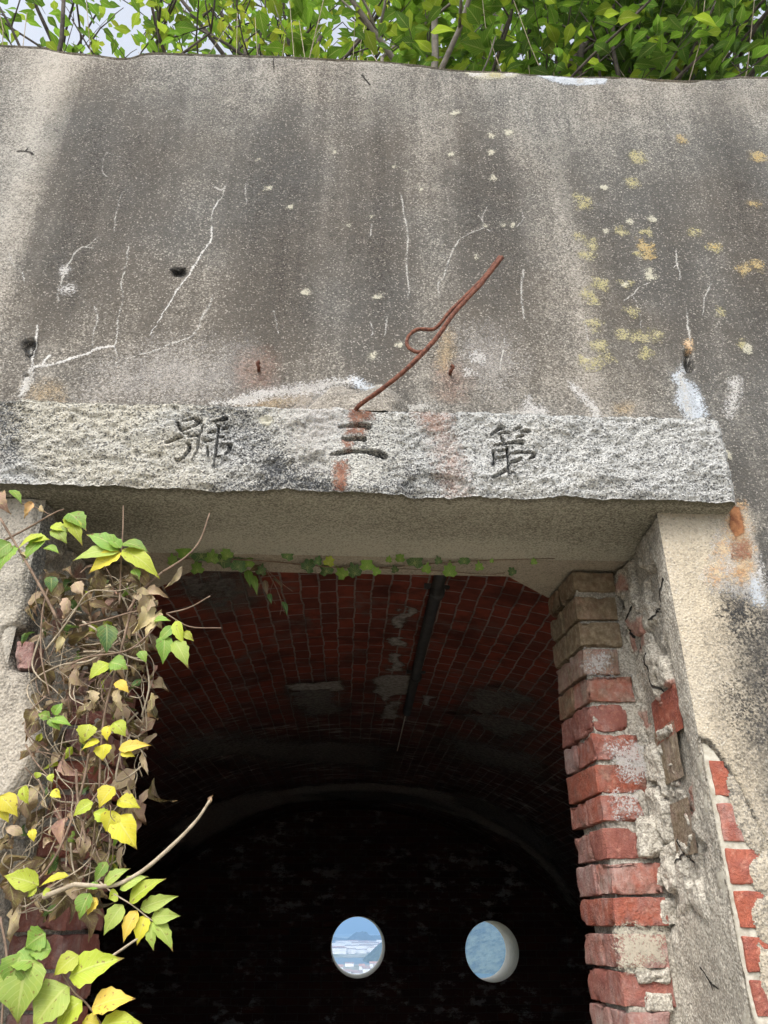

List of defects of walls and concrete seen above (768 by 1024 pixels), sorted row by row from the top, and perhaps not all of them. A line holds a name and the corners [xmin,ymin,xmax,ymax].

crack [20,183,247,395]
water stain [205,375,374,407]
water stain [511,398,550,416]
water stain [568,383,602,418]
water stain [672,368,708,420]
water stain [723,375,743,418]
rust [332,409,375,491]
rust [705,502,758,588]
crack [625,577,664,692]
spalling [651,683,684,785]
spalling [669,797,698,855]
spalling [696,735,768,1024]